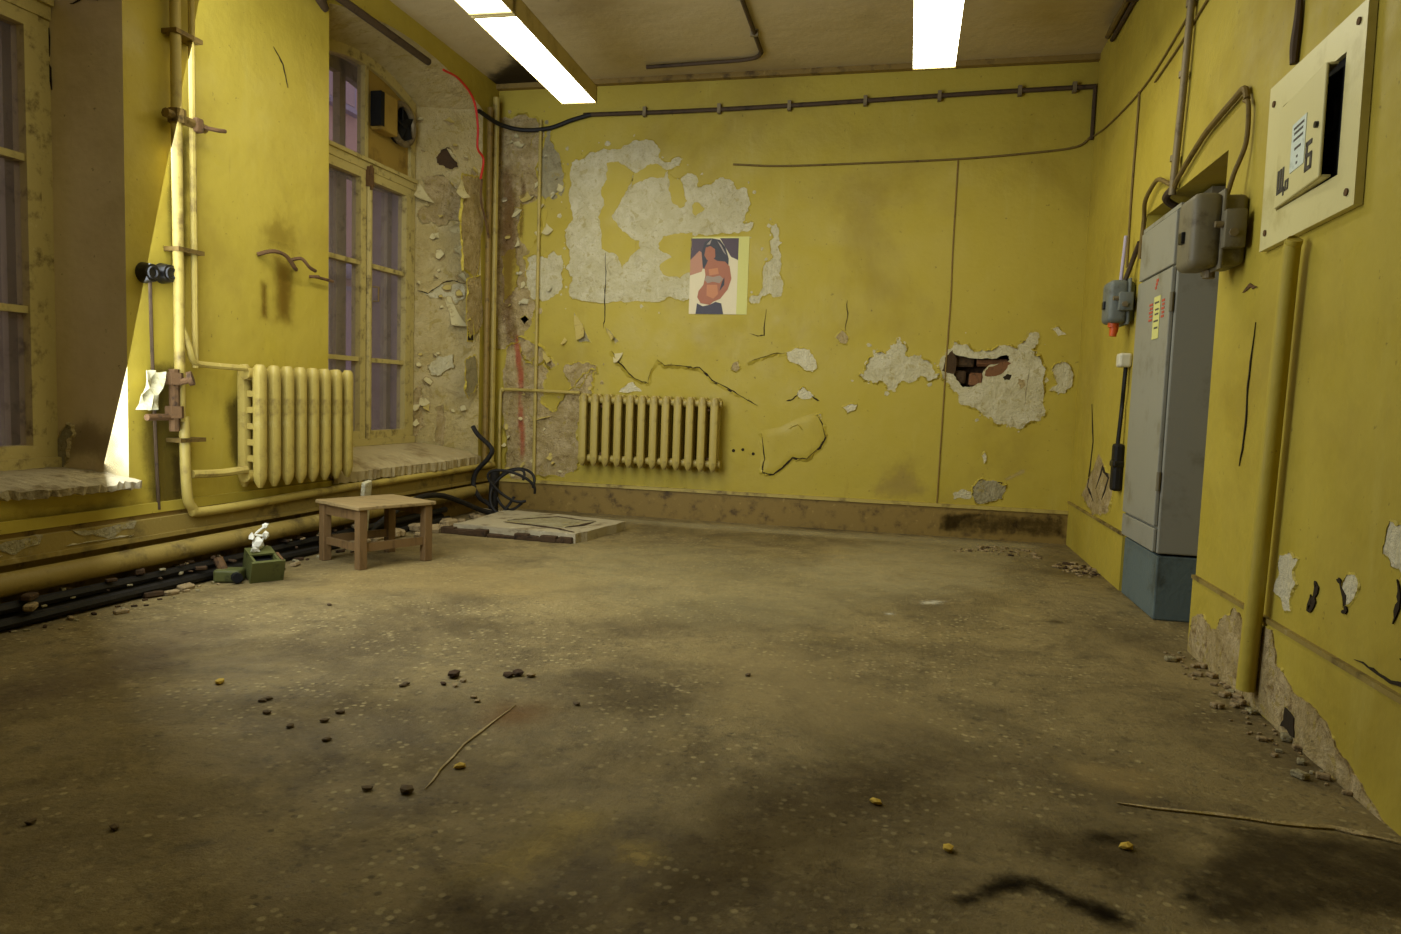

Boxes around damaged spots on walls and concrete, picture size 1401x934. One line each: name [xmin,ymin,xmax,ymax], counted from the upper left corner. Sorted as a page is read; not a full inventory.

peeling [413,107,785,480]
crack [603,253,828,478]
flaking render [851,325,1075,432]
flaking render [953,451,1007,506]
flaking render [68,520,136,546]
peeling [1382,518,1401,581]
peeling [1273,551,1300,613]
peeling [1341,572,1361,609]
flaking render [1187,607,1386,824]